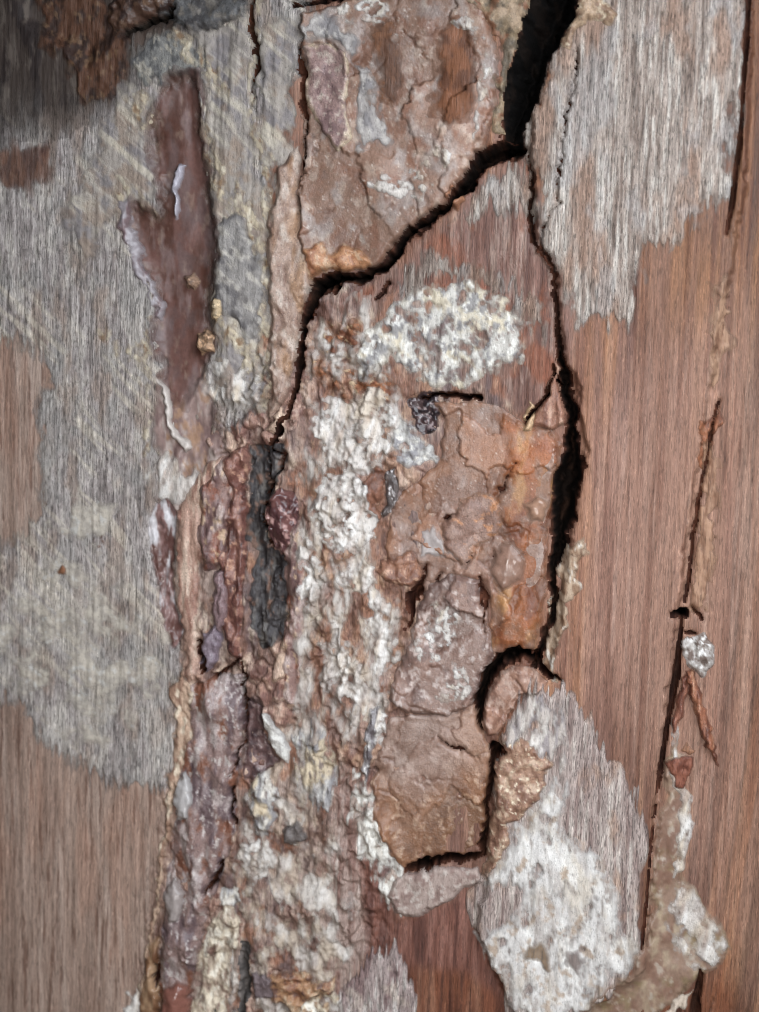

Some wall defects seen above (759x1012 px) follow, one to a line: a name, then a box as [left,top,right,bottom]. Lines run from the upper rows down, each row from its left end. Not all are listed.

crack [292,0,343,8]
crack [263,140,588,873]
spalling [148,498,184,647]
peeling [196,570,227,675]
spalling [403,564,441,631]
crack [641,401,720,950]
peeling [283,821,307,845]
water stain [665,743,694,874]